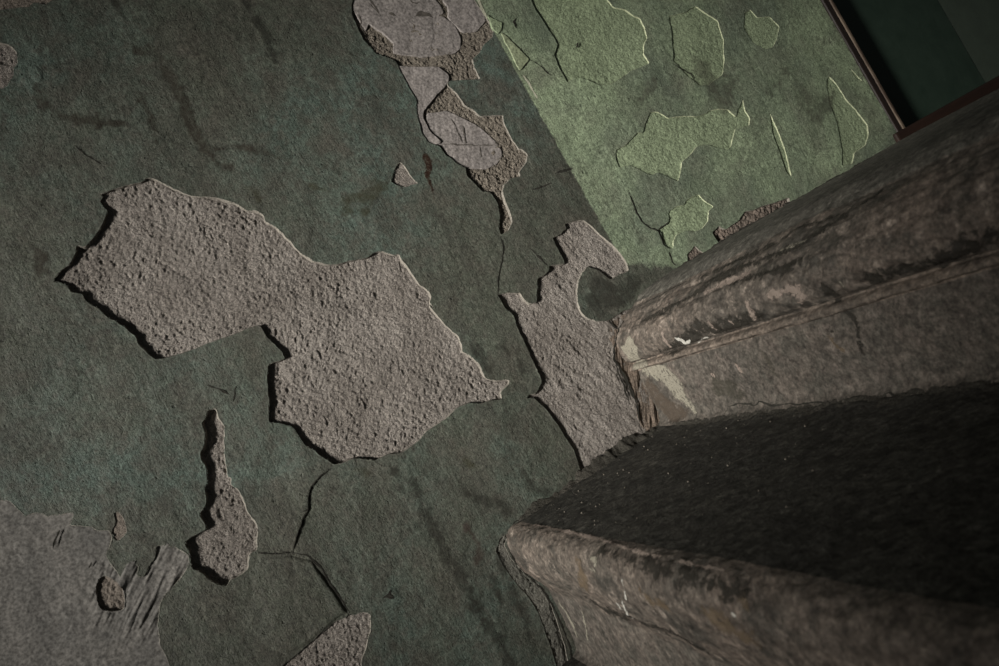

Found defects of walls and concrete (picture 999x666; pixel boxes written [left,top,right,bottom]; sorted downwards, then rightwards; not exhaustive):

peeling [531,0,650,86]
peeling [668,6,725,86]
flaking render [351,0,537,235]
peeling [615,99,751,182]
peeling [769,112,792,177]
peeling [826,76,869,166]
peeling [659,195,790,249]
flaking render [53,177,510,465]
flaking render [497,219,660,470]
peeling [0,408,259,666]
crack [260,468,350,613]
flaking render [282,611,372,666]